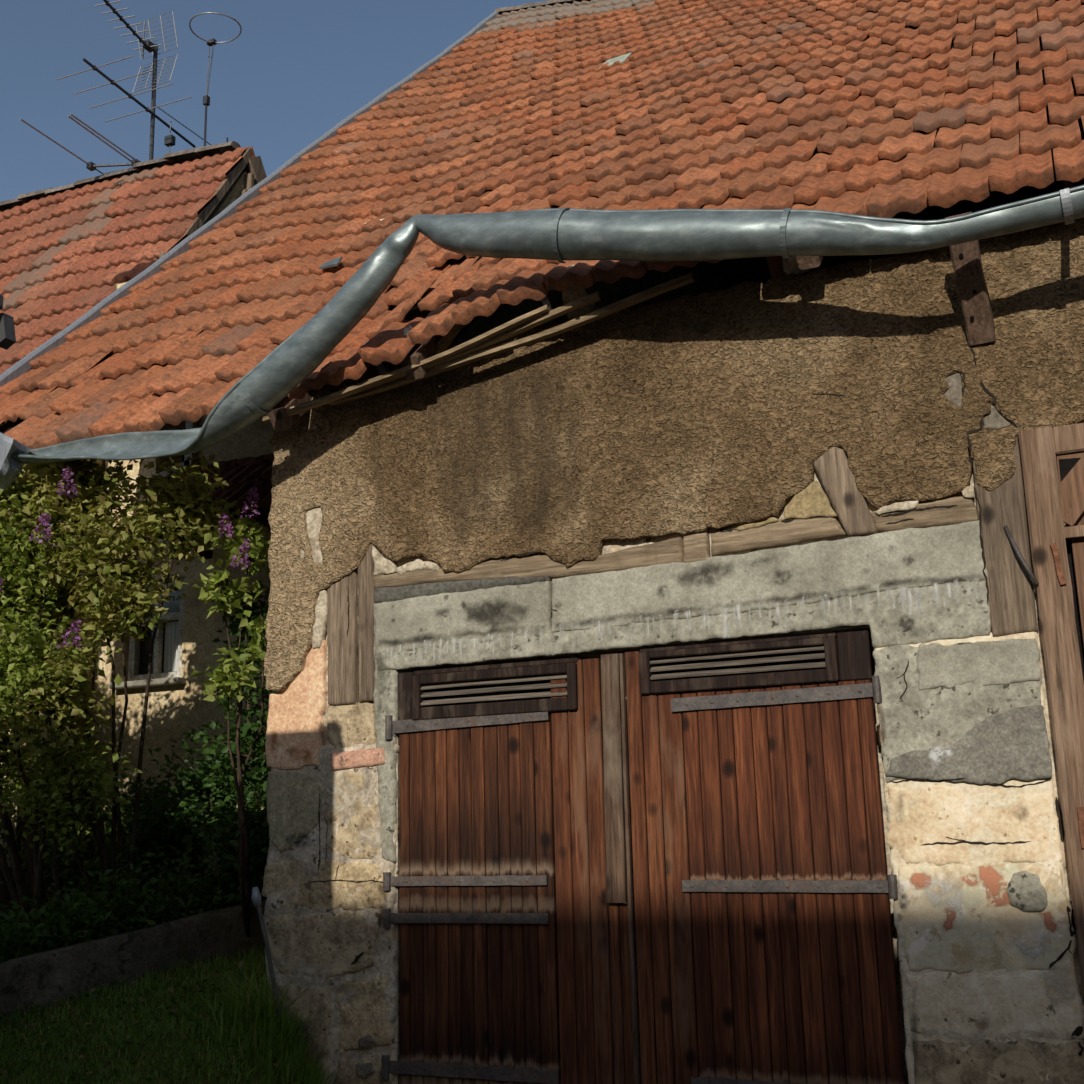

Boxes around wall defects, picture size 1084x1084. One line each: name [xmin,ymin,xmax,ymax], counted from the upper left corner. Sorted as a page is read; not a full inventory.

flaking render [944,373,962,408]
crack [882,346,1017,604]
flaking render [300,508,322,564]
flaking render [372,546,440,575]
flaking render [737,481,838,531]
flaking render [875,501,919,515]
flaking render [312,590,328,649]
water stain [386,603,527,662]
crack [890,776,964,784]
crack [992,780,1064,842]
crack [923,837,1030,845]
crack [1049,906,1076,969]